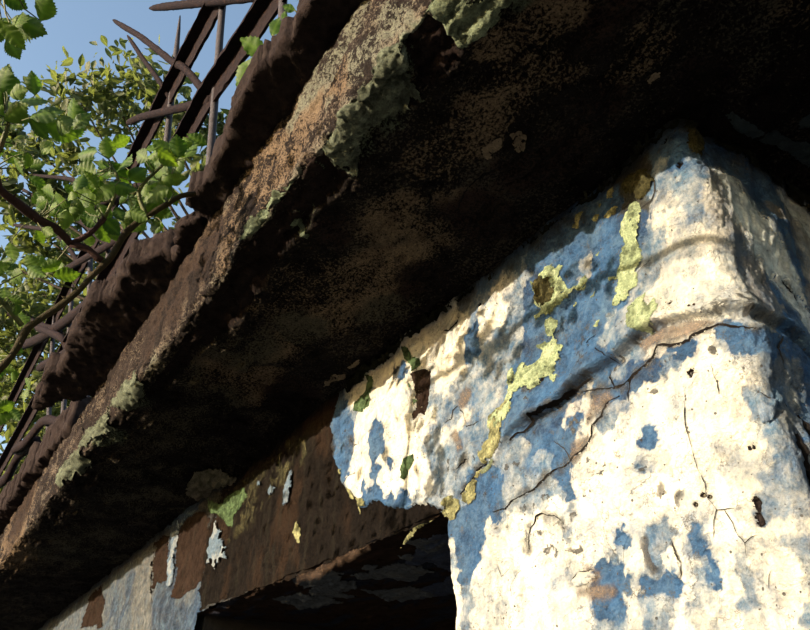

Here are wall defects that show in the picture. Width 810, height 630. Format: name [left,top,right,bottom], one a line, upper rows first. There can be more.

peeling [509,131,527,153]
damp [715,170,810,334]
spalling [410,369,431,420]
crack [447,289,765,558]
crack [784,402,810,485]
spalling [150,393,446,611]
hole [754,512,766,527]
spalling [81,586,105,628]